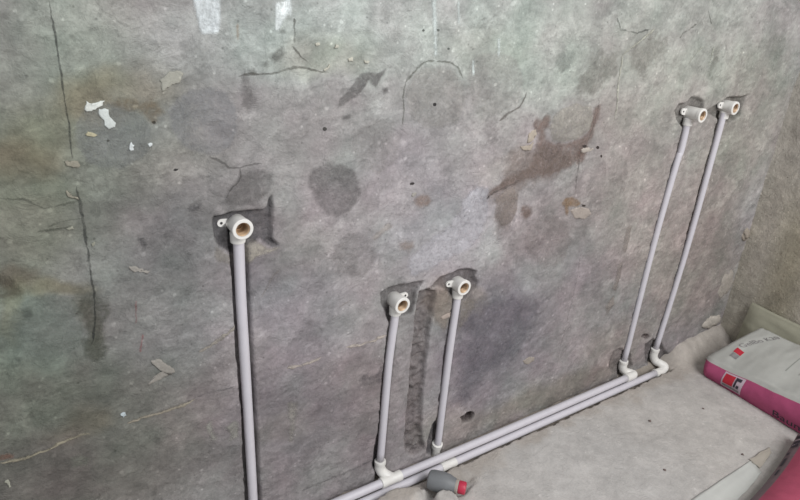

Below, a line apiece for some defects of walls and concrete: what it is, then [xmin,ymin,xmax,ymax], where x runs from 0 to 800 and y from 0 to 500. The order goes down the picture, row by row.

peeling [84,101,116,129]
damp [340,72,386,105]
crack [78,195,96,339]
damp [331,99,740,500]